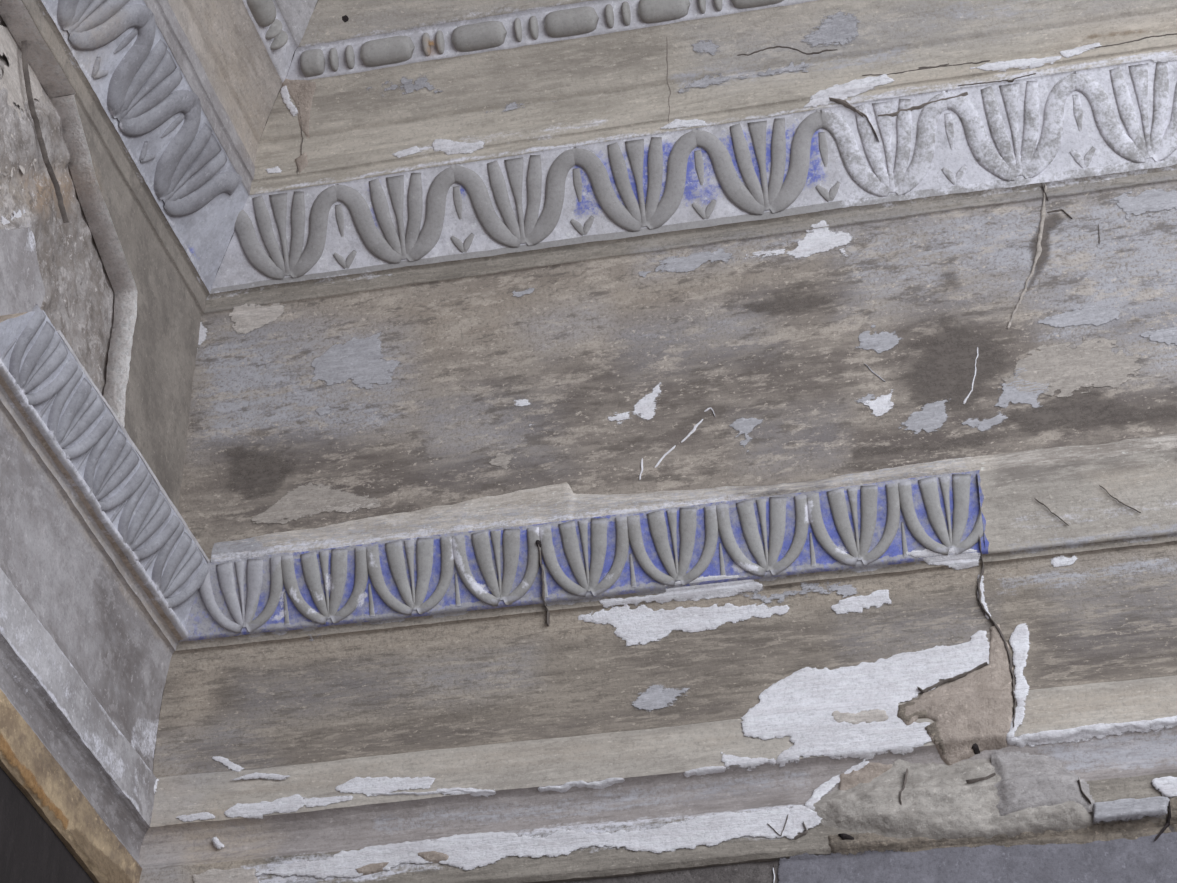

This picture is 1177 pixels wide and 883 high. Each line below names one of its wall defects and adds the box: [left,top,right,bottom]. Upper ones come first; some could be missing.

peeling [0,25,44,118]
crack [737,46,837,56]
crack [829,60,1036,141]
crack [1086,33,1177,50]
peeling [638,220,852,277]
crack [1007,184,1100,329]
water stain [907,319,1005,406]
water stain [1012,392,1177,431]
peeling [906,548,981,570]
peeling [578,575,892,646]
crack [976,537,1030,741]
peeling [176,624,1177,883]